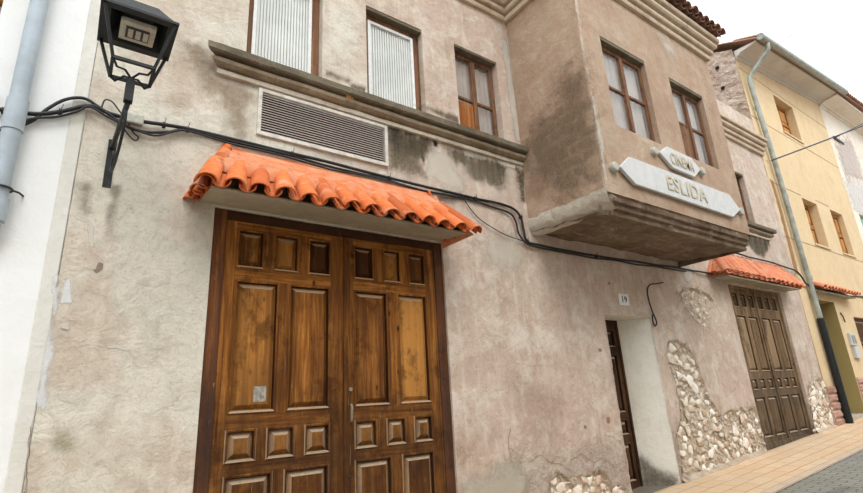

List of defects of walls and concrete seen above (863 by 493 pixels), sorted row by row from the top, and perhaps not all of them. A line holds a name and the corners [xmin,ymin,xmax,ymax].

damp [388,39,600,202]
spalling [657,267,714,327]
crack [508,429,616,473]
spalling [549,317,633,493]
spalling [650,319,766,480]
spalling [808,379,837,434]